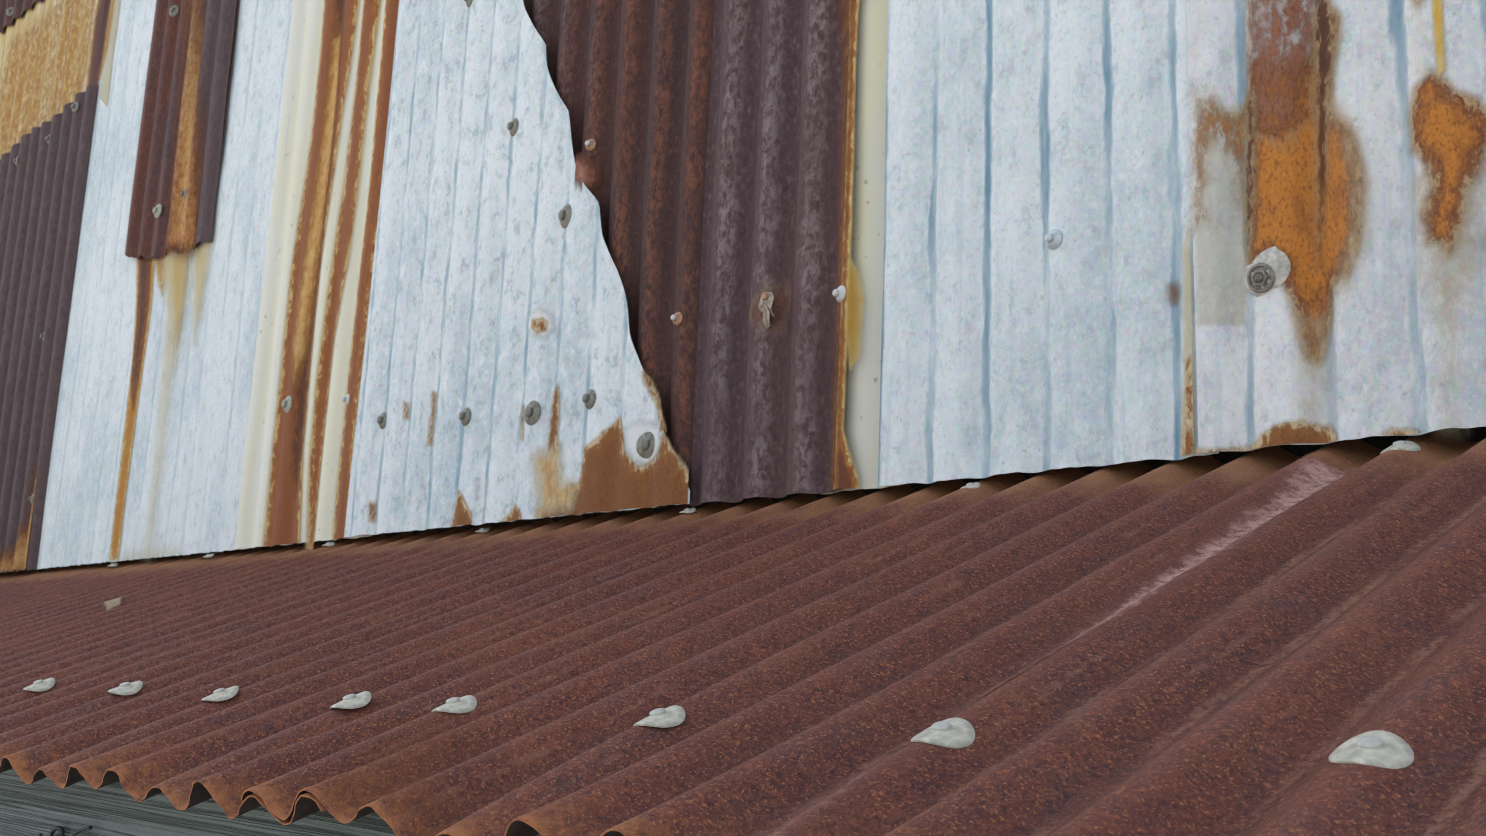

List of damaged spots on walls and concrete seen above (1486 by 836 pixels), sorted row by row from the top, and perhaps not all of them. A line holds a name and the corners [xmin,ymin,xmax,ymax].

corrosion [0,477,37,572]
corrosion [0,0,120,152]
corrosion [109,32,210,560]
corrosion [263,0,399,550]
corrosion [427,392,437,445]
corrosion [451,490,471,527]
corrosion [528,308,554,338]
corrosion [501,371,689,521]
corrosion [831,0,863,490]
corrosion [1181,230,1337,456]
corrosion [1245,0,1365,363]
corrosion [1410,0,1486,255]